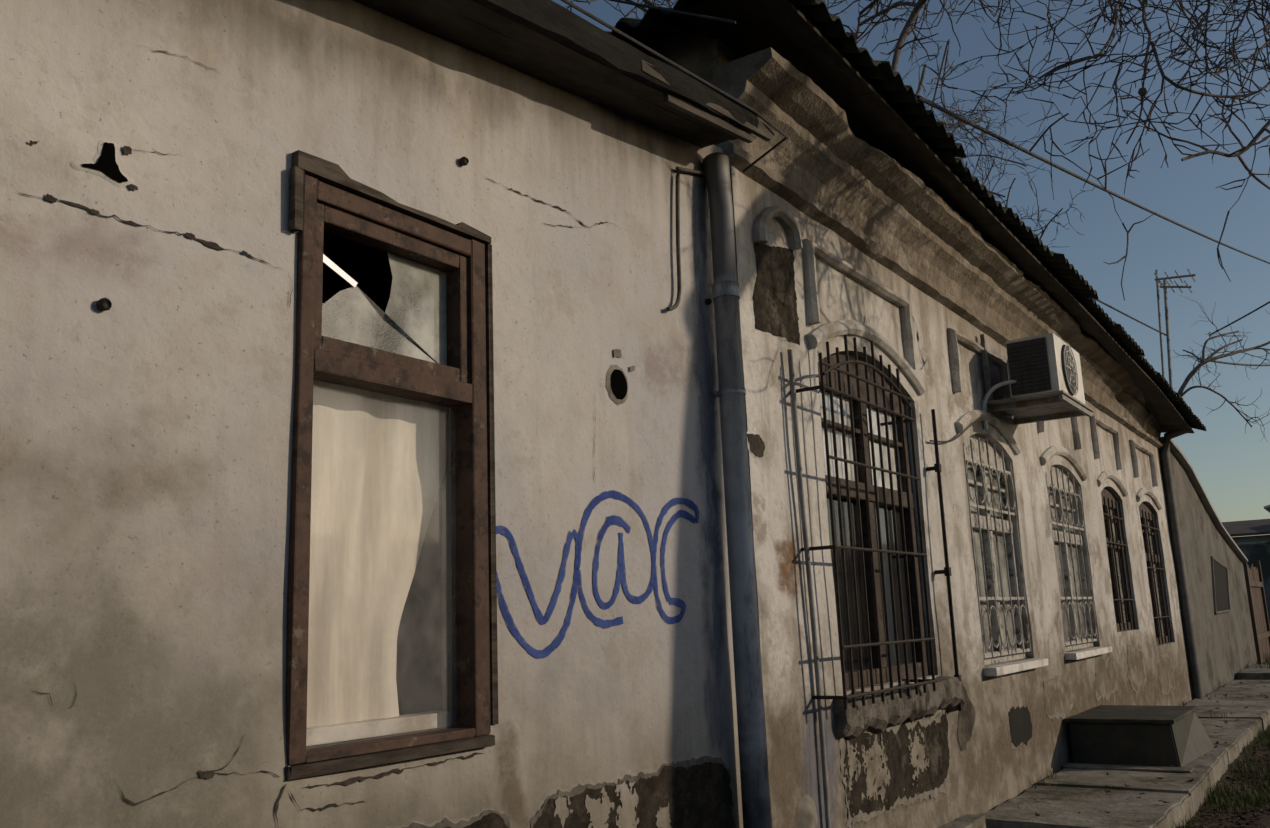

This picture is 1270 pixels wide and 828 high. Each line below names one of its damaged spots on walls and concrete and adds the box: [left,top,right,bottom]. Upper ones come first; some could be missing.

crack [17,191,293,307]
crack [485,177,623,229]
peeling [373,751,736,828]
spalling [836,683,976,828]